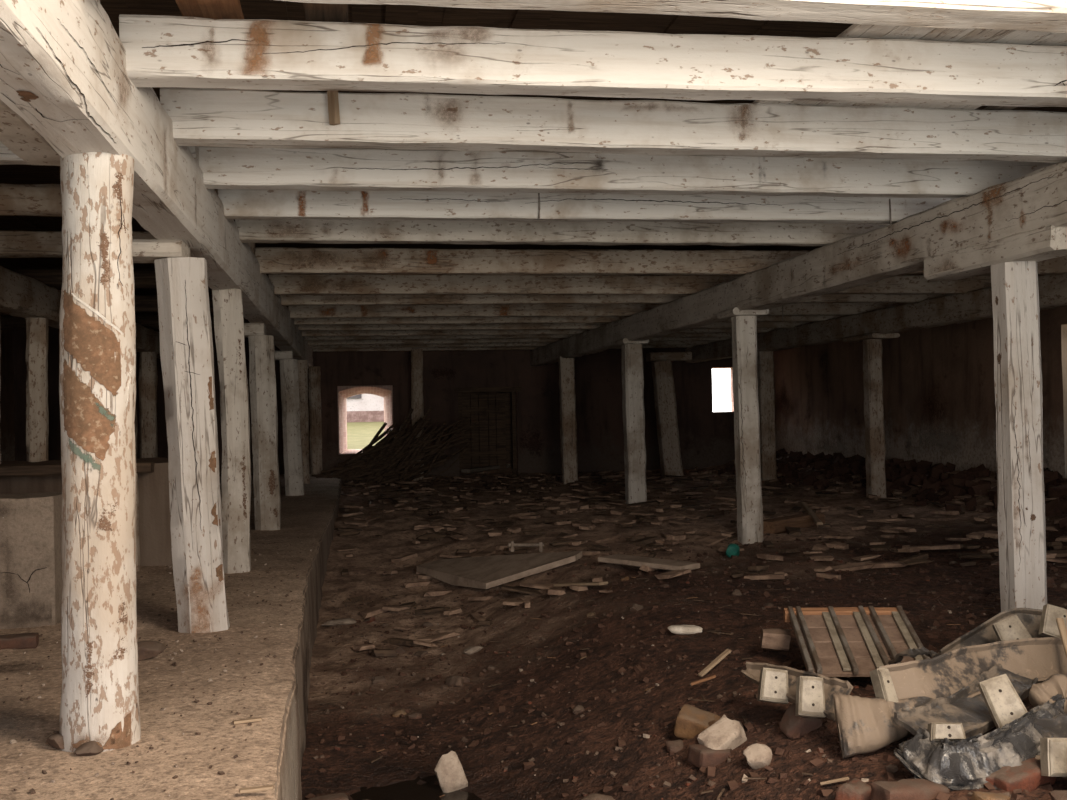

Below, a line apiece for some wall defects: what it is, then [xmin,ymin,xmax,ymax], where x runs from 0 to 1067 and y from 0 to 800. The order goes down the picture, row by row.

peeling [62,290,133,470]
peeling [96,505,116,531]
crack [2,567,47,593]
peeling [83,641,95,697]
peeling [72,712,131,750]